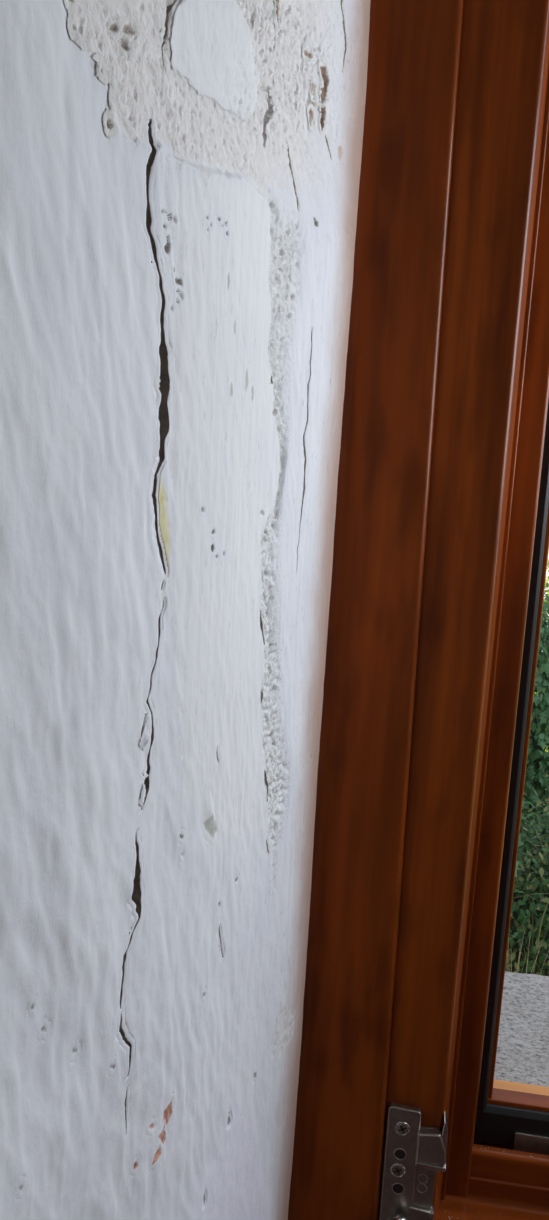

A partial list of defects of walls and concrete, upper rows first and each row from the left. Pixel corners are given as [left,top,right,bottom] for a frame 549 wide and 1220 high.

crack [116,114,174,1139]
flaking render [64,0,371,897]
crack [295,327,314,581]